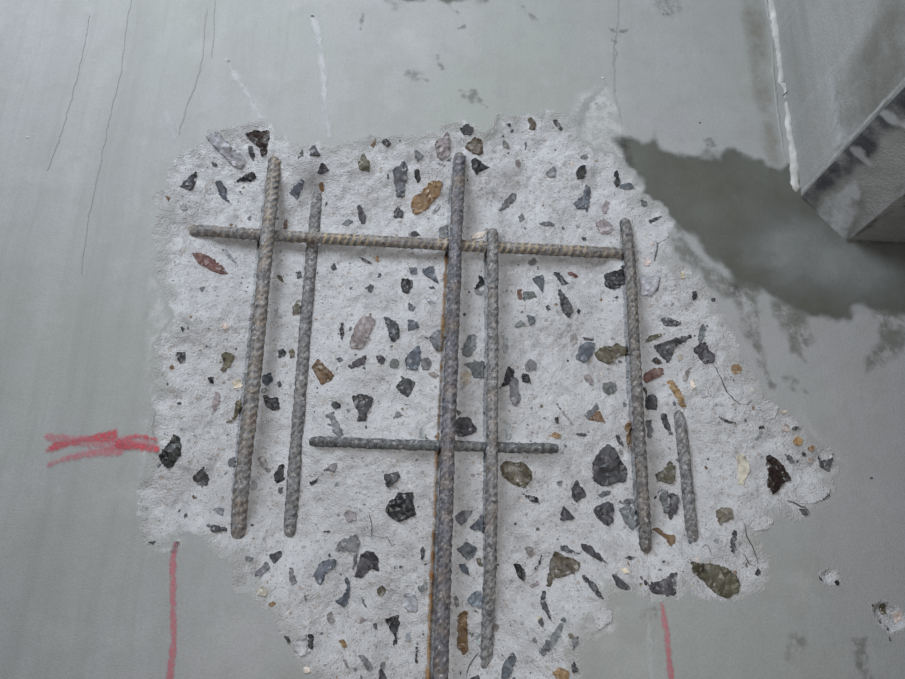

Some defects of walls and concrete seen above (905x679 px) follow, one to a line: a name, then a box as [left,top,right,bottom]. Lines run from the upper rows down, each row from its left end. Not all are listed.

leakage [617,134,905,364]
spalling [135,109,843,679]
spalling [870,599,905,642]